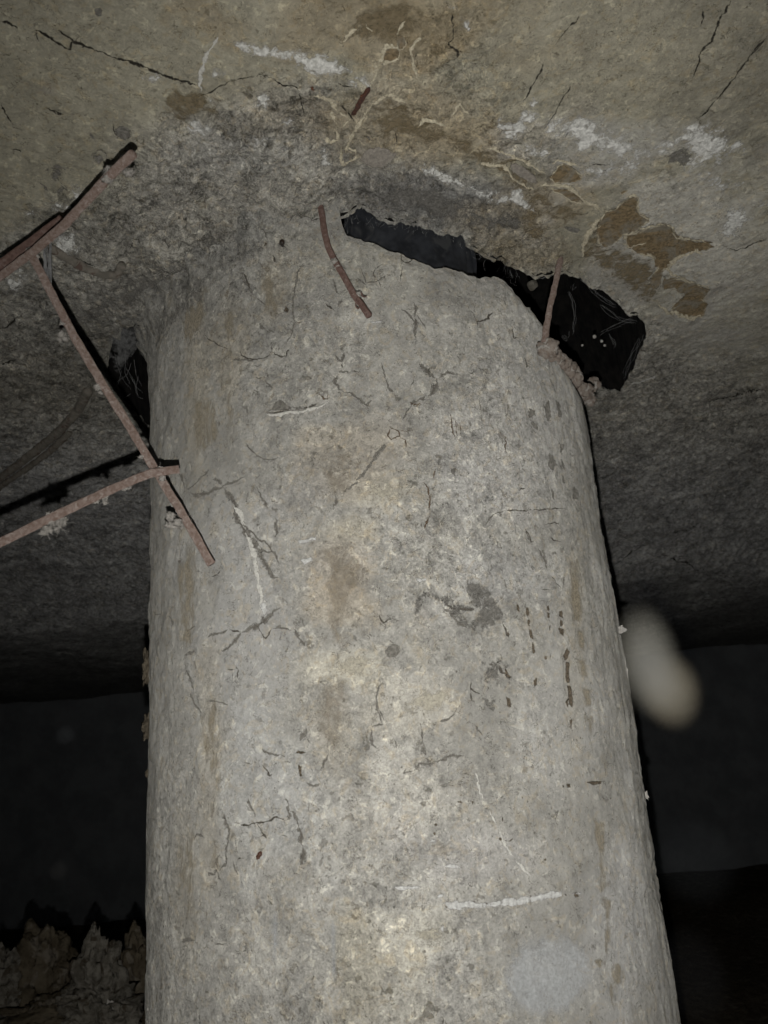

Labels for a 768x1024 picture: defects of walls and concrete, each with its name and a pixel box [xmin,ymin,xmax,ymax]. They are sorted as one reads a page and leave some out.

crack [2,20,304,113]
crack [694,1,731,73]
crack [699,37,767,118]
leakage [314,93,745,302]
crack [179,443,279,579]